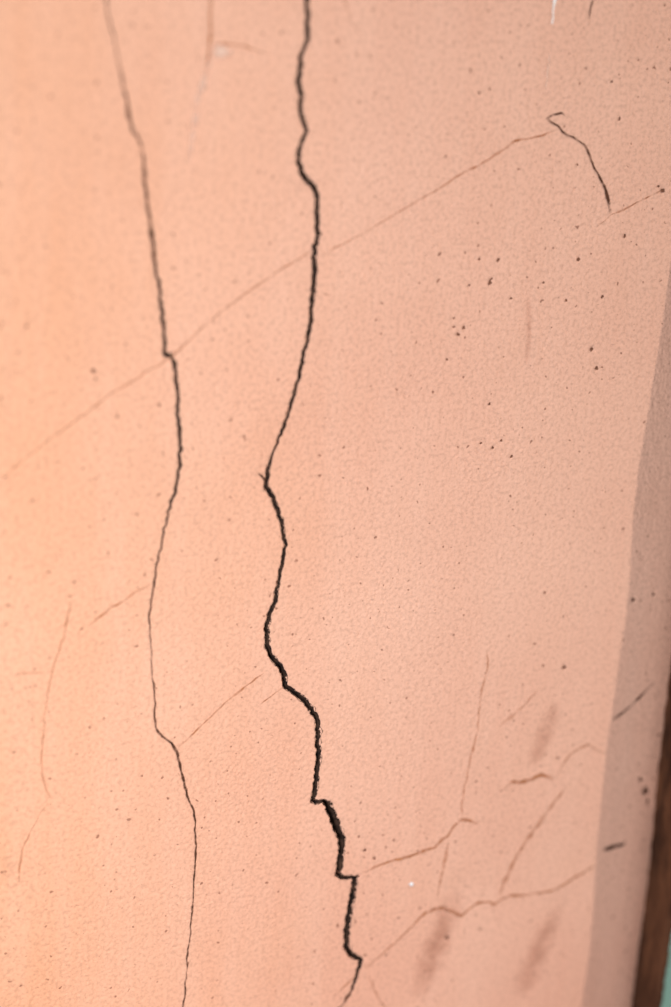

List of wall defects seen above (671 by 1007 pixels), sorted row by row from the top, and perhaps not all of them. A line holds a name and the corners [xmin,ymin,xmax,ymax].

crack [513,112,648,209]
crack [105,0,206,1007]
crack [223,0,519,1007]
crack [512,774,547,783]
crack [547,843,624,892]